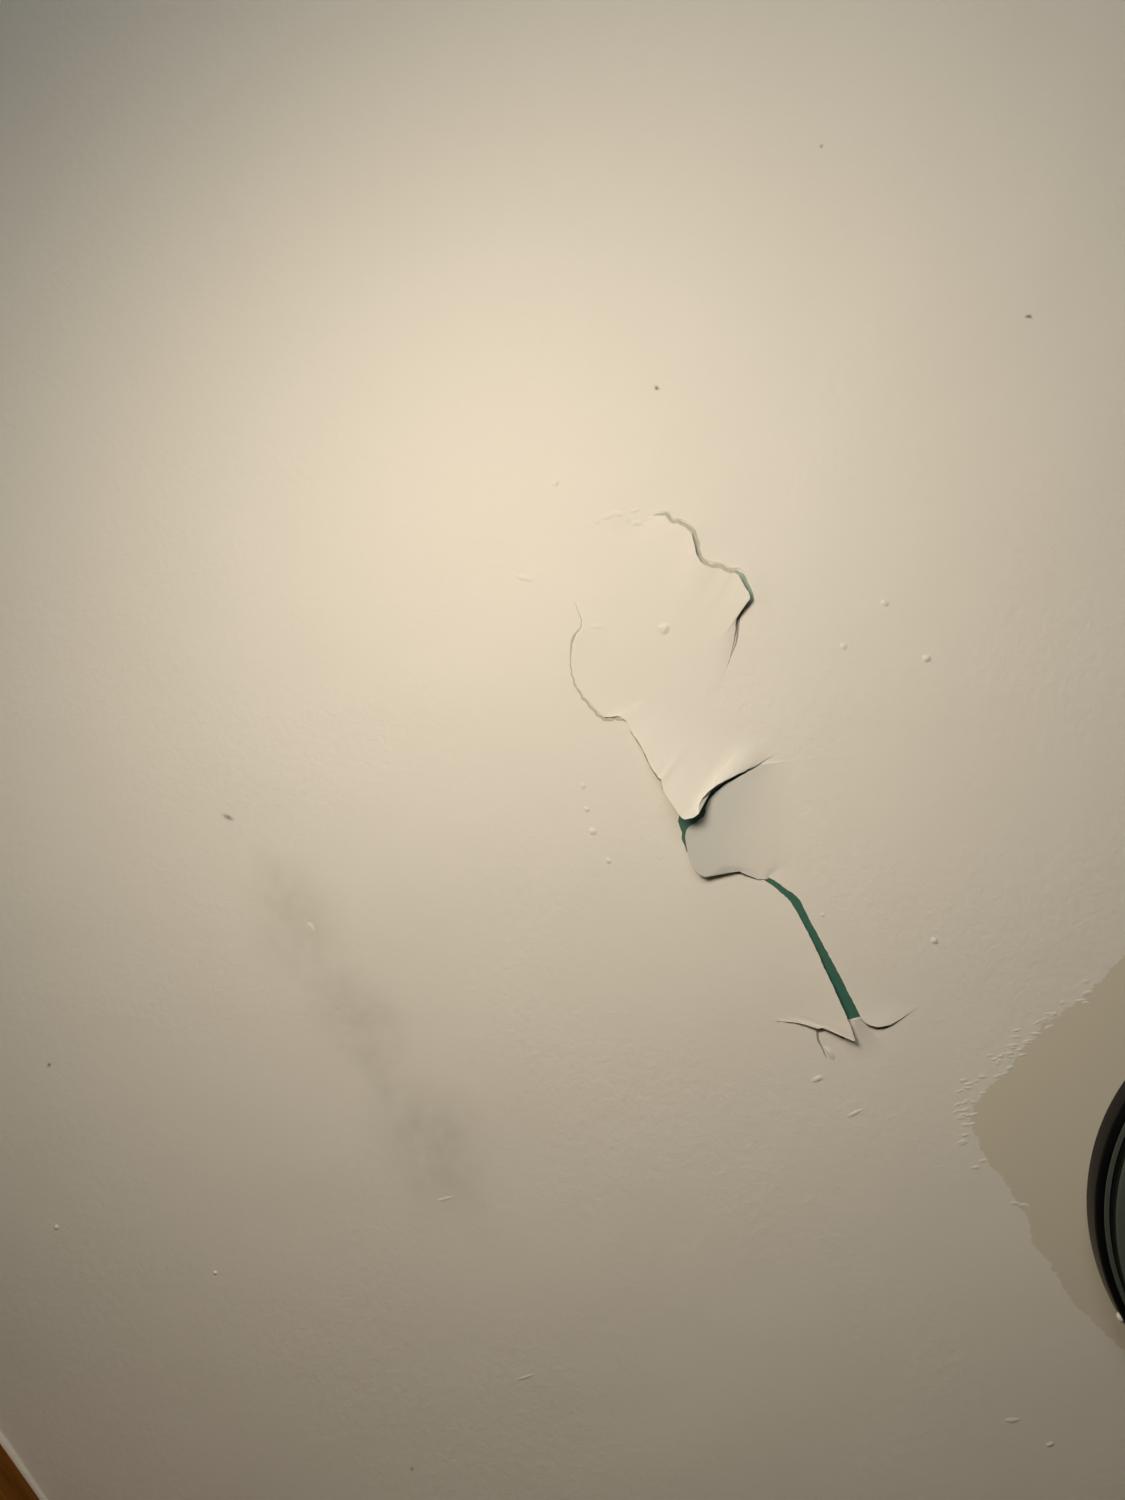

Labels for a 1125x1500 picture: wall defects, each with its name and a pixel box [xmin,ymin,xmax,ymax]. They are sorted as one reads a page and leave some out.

peeling [626,691,919,1060]